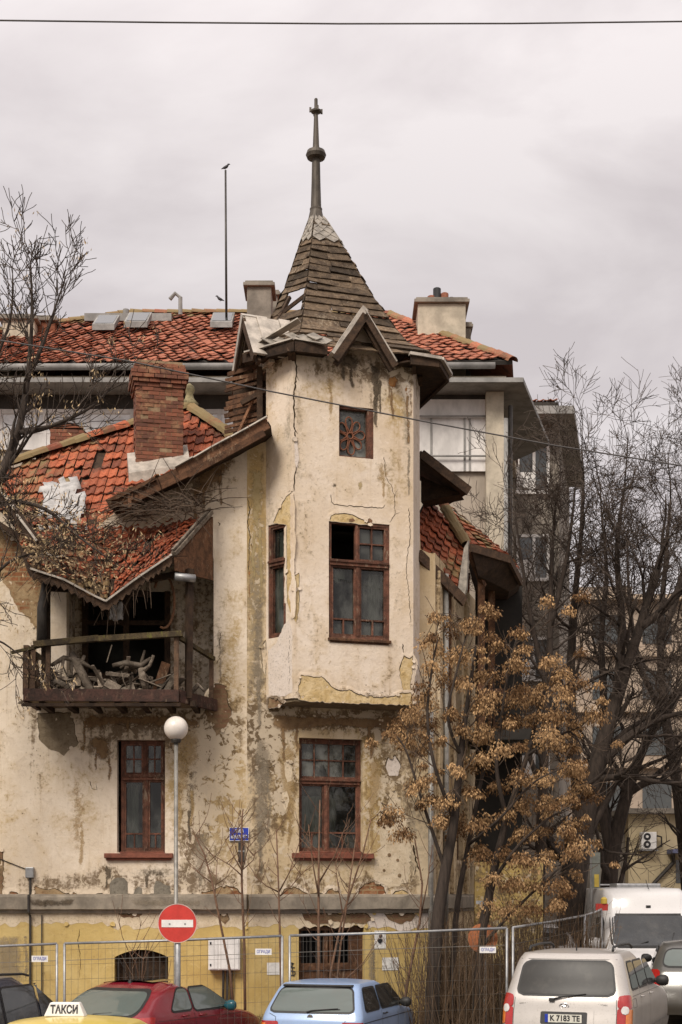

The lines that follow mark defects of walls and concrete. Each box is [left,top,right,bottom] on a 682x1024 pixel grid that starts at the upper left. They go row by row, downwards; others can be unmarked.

leakage [328,354,382,427]
crack [289,360,299,574]
flaking render [0,528,41,639]
flaking render [270,491,305,624]
flaking render [33,708,82,756]
flaking render [266,652,418,894]
flaking render [197,882,245,894]